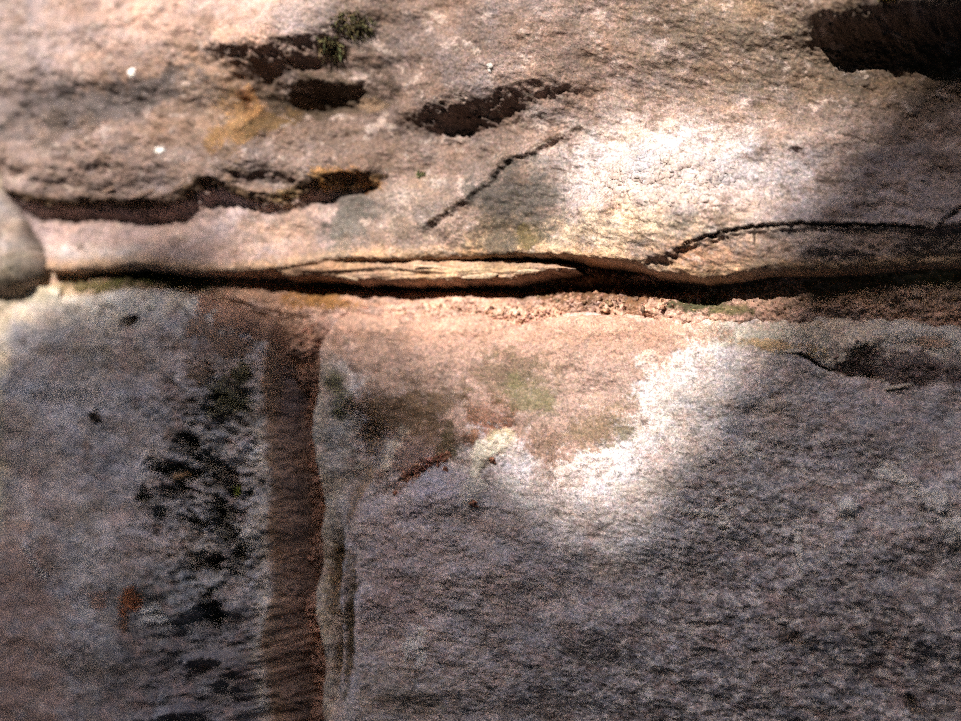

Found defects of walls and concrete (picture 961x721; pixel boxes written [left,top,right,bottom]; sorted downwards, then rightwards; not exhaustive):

crack [674,214,961,250]
water stain [143,605,168,624]